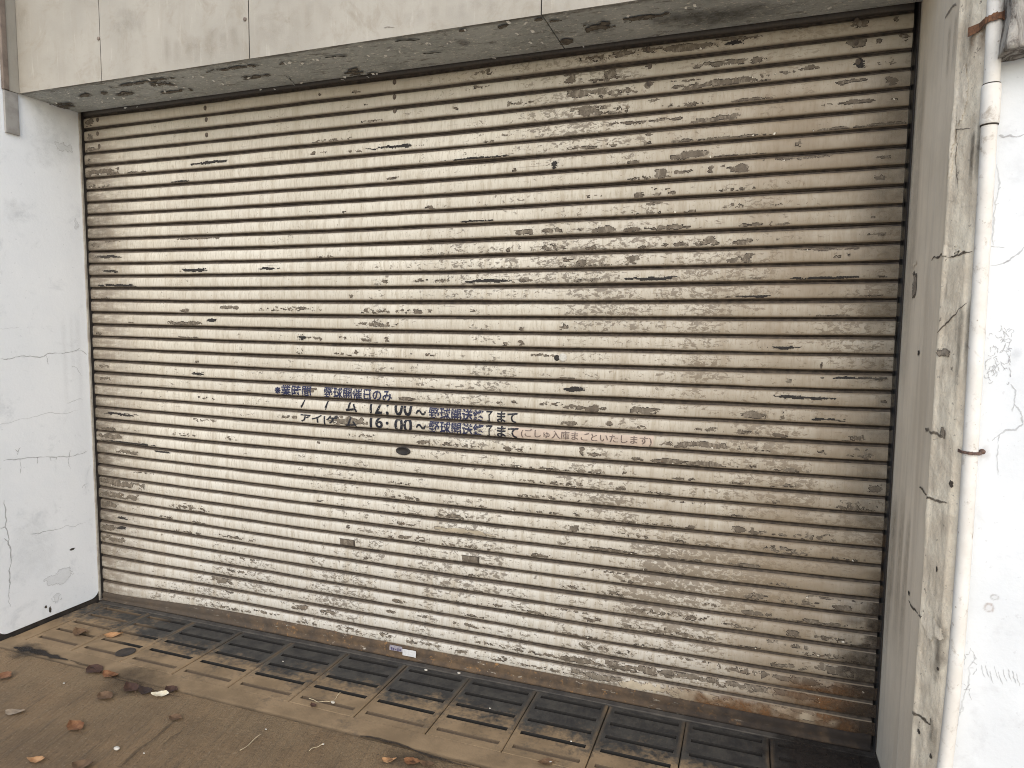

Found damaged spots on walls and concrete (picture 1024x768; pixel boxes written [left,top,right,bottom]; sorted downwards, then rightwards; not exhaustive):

peeling [583,12,671,33]
peeling [50,65,276,109]
peeling [570,56,820,146]
peeling [514,132,832,282]
crack [931,250,972,261]
peeling [167,308,202,338]
peeling [540,401,613,426]
peeling [631,410,770,481]
peeling [384,481,496,551]
peeling [501,464,601,532]
peeling [589,546,637,554]
peeling [291,574,871,706]